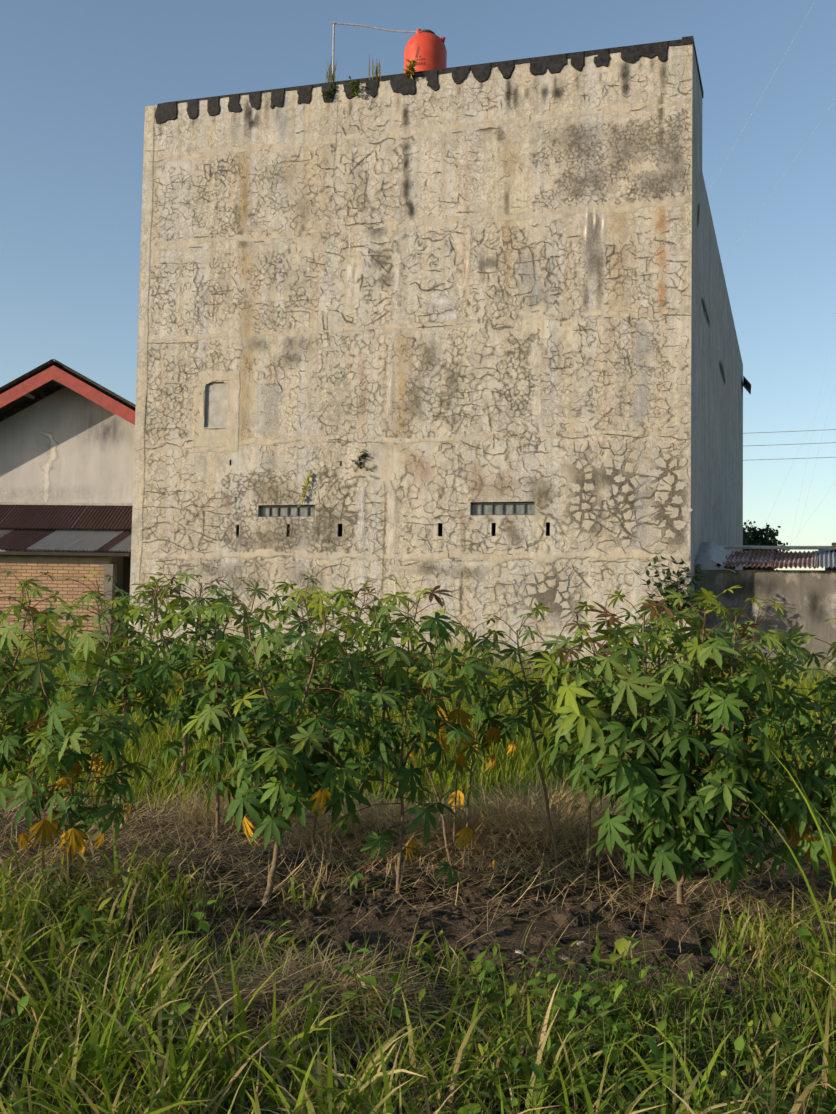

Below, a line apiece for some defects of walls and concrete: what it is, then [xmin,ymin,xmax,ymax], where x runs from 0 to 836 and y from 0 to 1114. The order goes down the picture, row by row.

damp [404,145,413,216]
damp [585,213,604,245]
crack [42,432,58,502]